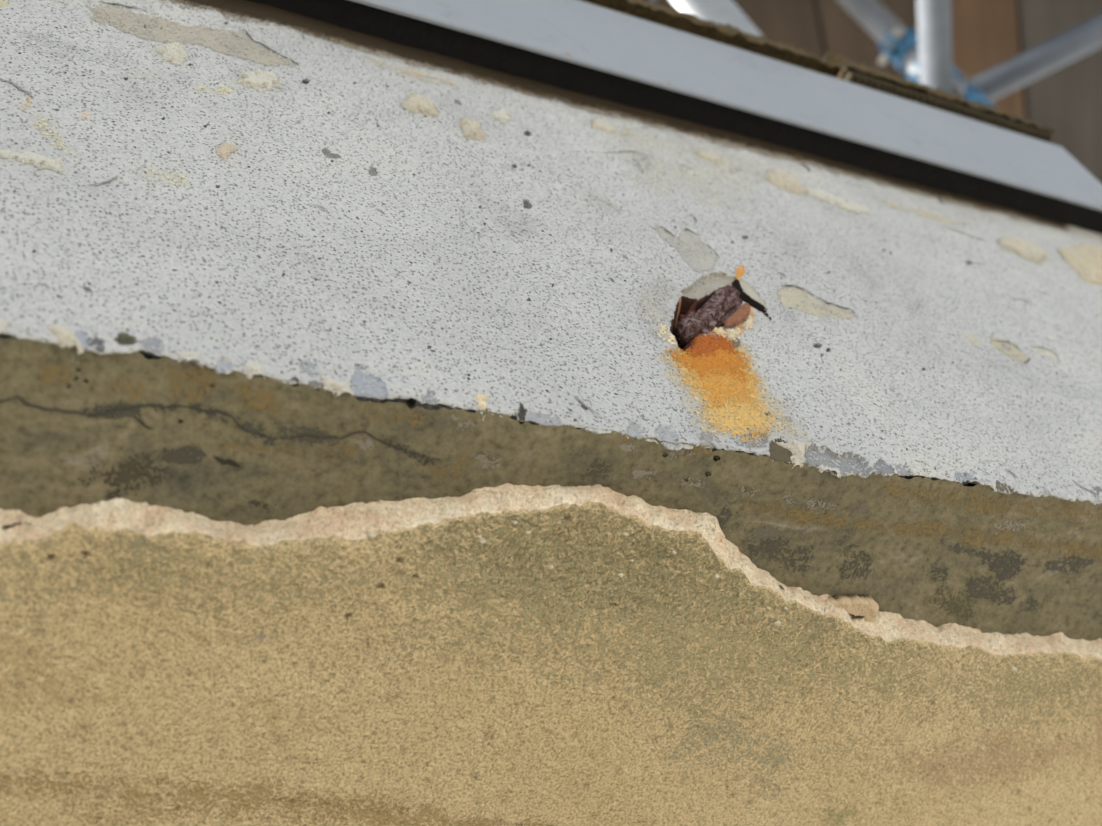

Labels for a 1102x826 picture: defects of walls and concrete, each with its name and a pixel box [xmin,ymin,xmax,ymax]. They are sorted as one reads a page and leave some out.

spalling [669,271,769,349]
peeling [75,330,163,356]
crack [0,396,442,461]
peeling [350,365,388,399]
peeling [406,391,437,409]
peeling [517,402,561,426]
rust [654,306,829,449]
crack [214,457,241,468]
peeling [736,431,911,478]
peeling [996,480,1014,494]
spalling [0,483,1102,659]
water stain [0,762,553,826]